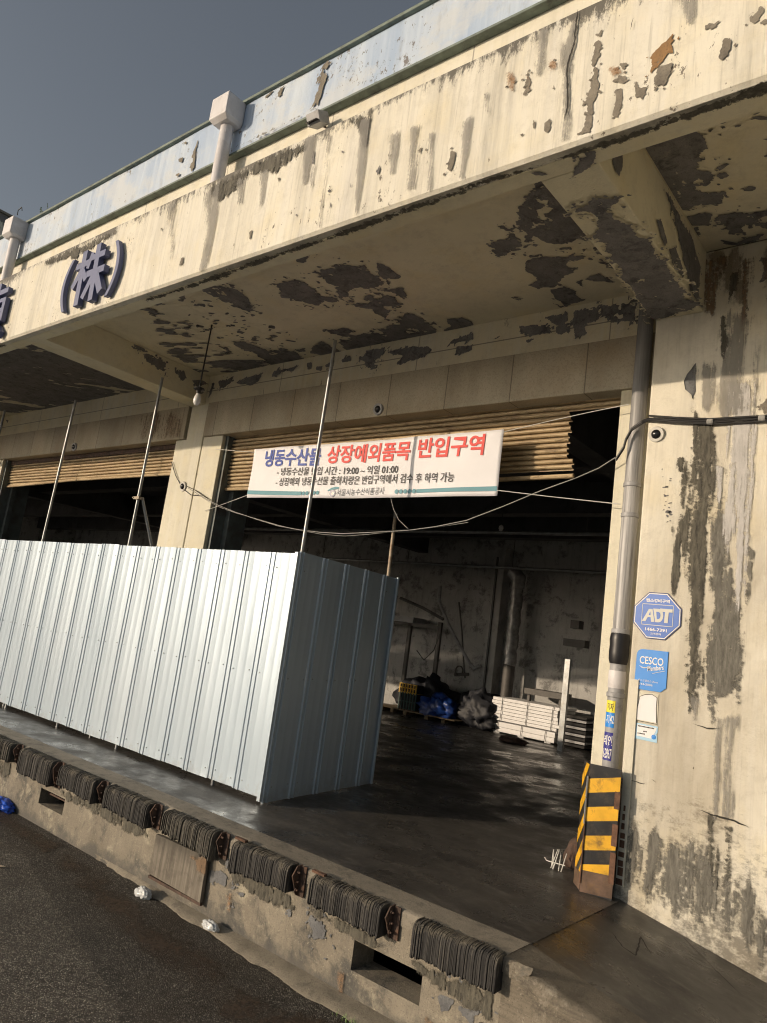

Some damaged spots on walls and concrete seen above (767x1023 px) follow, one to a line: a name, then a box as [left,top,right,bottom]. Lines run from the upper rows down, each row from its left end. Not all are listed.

water stain [535,28,548,75]
water stain [560,21,575,140]
crack [564,11,578,120]
peeling [577,30,603,135]
peeling [612,34,679,119]
water stain [558,82,767,159]
water stain [679,0,696,24]
water stain [146,108,542,302]
peeling [486,112,767,343]
peeling [131,254,473,398]
peeling [0,344,145,423]
water stain [671,247,757,888]